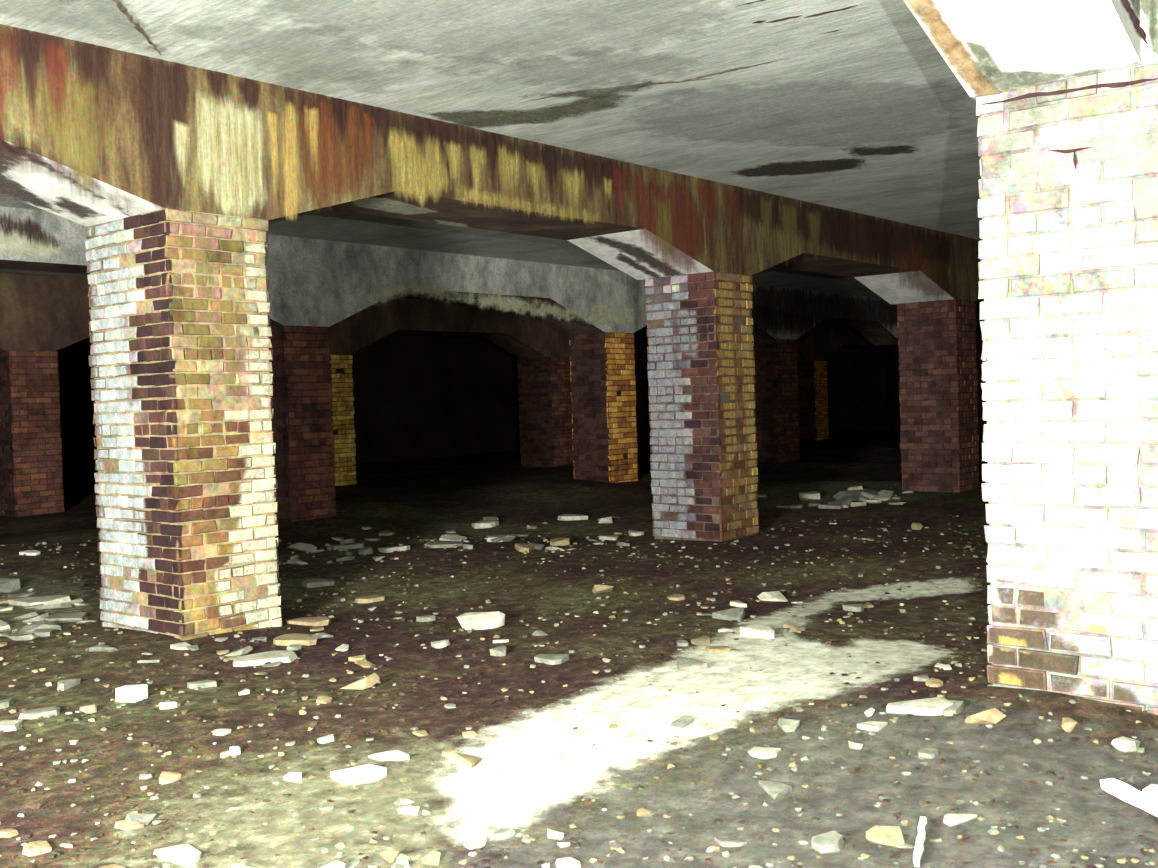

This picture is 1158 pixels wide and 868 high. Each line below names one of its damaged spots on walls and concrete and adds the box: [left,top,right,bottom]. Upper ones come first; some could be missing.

crack [112,0,161,55]
corrosion [904,0,998,95]
crack [1121,0,1149,45]
corrosion [303,104,374,199]
leakage [735,146,914,177]
leakage [0,231,61,256]
corrosion [614,170,739,270]